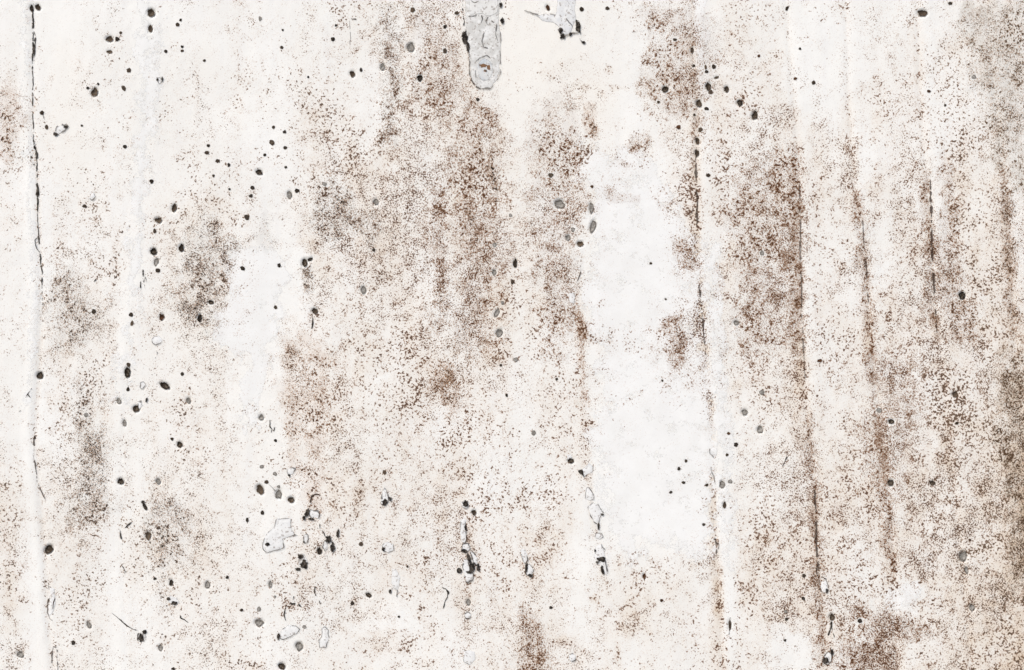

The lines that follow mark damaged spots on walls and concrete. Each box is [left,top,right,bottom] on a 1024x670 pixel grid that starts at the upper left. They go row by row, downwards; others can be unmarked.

spalling [455,0,504,101]
spalling [524,0,586,44]
crack [30,9,43,305]
damp [306,171,393,257]
damp [373,0,589,374]
damp [918,163,981,345]
damp [672,148,813,586]
damp [849,177,928,582]
peeling [261,508,339,571]
peeling [457,500,480,584]
peeling [568,458,608,575]
damp [802,413,933,670]